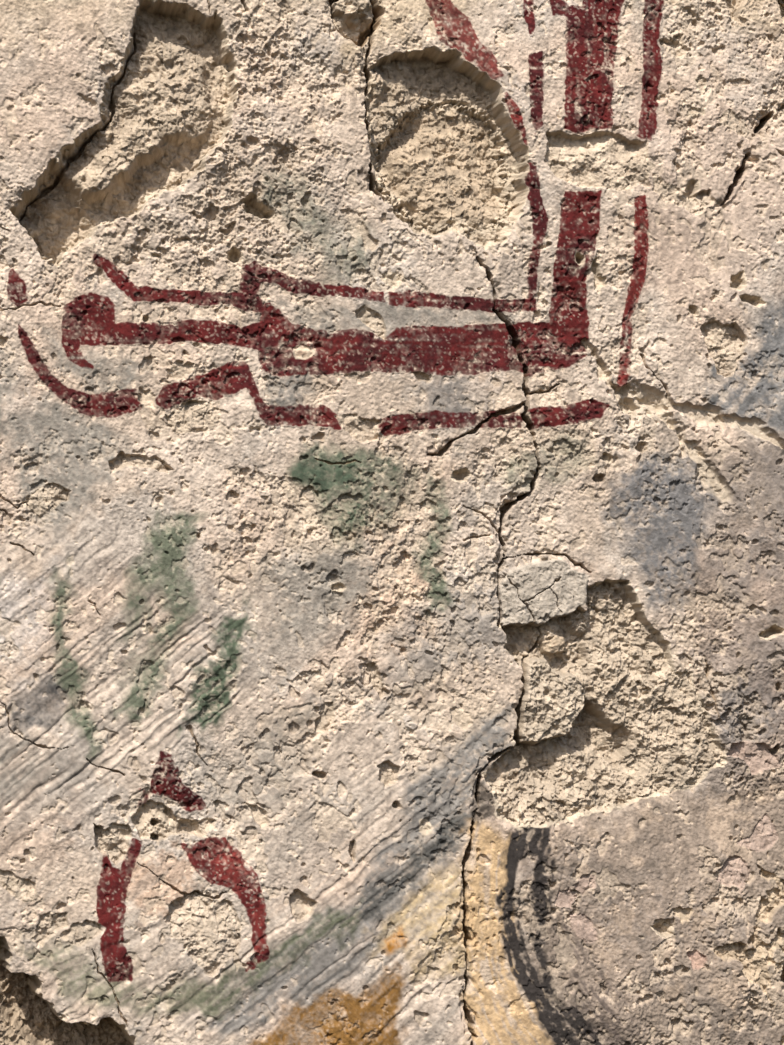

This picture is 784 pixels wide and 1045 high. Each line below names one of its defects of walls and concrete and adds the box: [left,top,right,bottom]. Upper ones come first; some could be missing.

spalling [10,0,239,268]
crack [328,0,386,204]
spalling [366,46,530,251]
peeling [543,130,717,216]
crack [314,458,362,466]
crack [427,251,593,629]
crack [521,623,544,694]
spalling [482,579,784,831]
spalling [0,937,65,1022]
peeling [0,869,103,948]
spalling [108,1017,136,1045]
crack [461,728,522,1045]